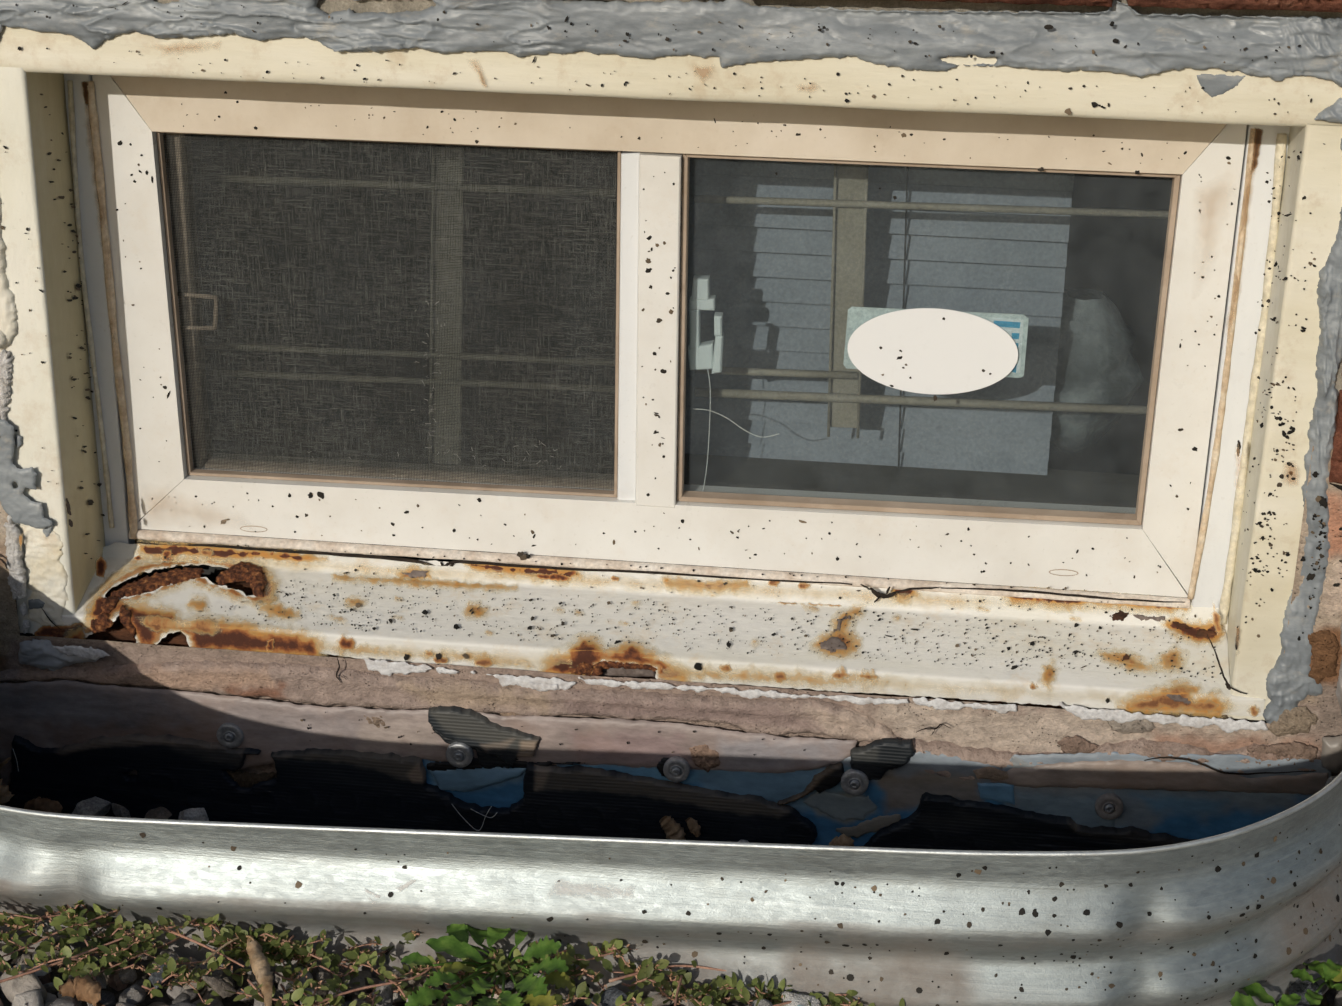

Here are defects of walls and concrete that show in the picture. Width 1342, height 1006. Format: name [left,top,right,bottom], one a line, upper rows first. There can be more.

corrosion [334,564,581,599]
corrosion [663,577,749,592]
corrosion [34,542,385,656]
corrosion [465,605,486,617]
corrosion [517,583,877,685]
corrosion [426,651,497,667]
corrosion [1009,597,1239,717]
spalling [364,715,385,728]
spalling [689,744,720,772]